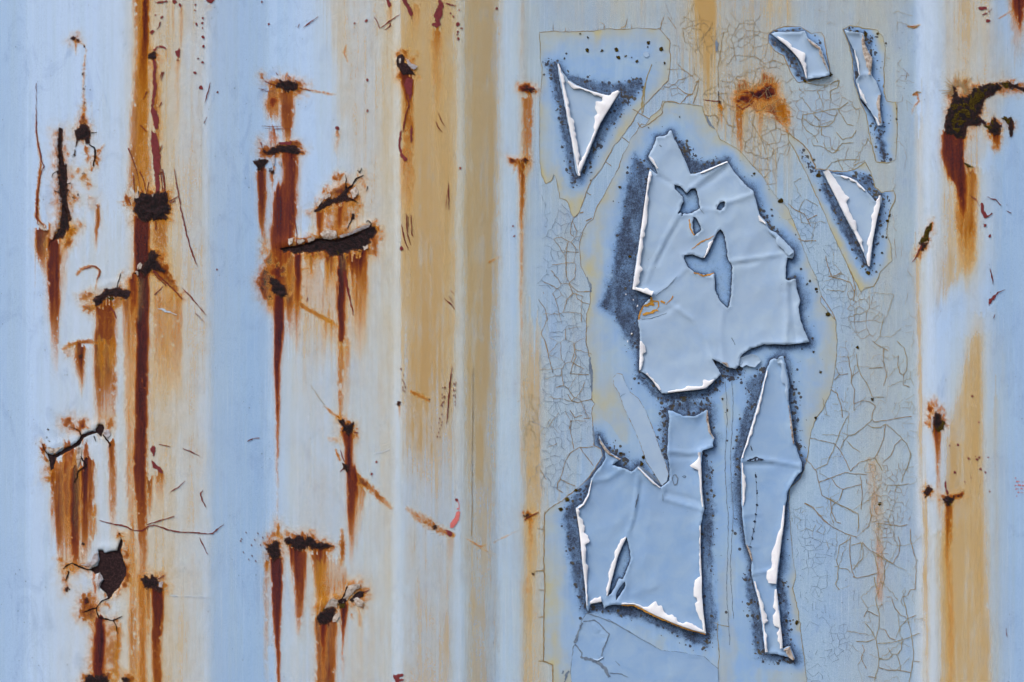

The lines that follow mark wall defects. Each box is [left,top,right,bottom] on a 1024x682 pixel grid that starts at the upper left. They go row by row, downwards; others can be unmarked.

rust [259,73,331,142]
rust [508,82,537,237]
rust [703,73,790,150]
peeling [788,25,898,292]
rust [940,74,1024,255]
rust [80,0,183,682]
rust [254,250,337,456]
rust [240,386,390,682]
crack [517,174,594,682]
peeling [539,26,837,682]
crack [622,3,931,682]
rust [922,456,989,579]